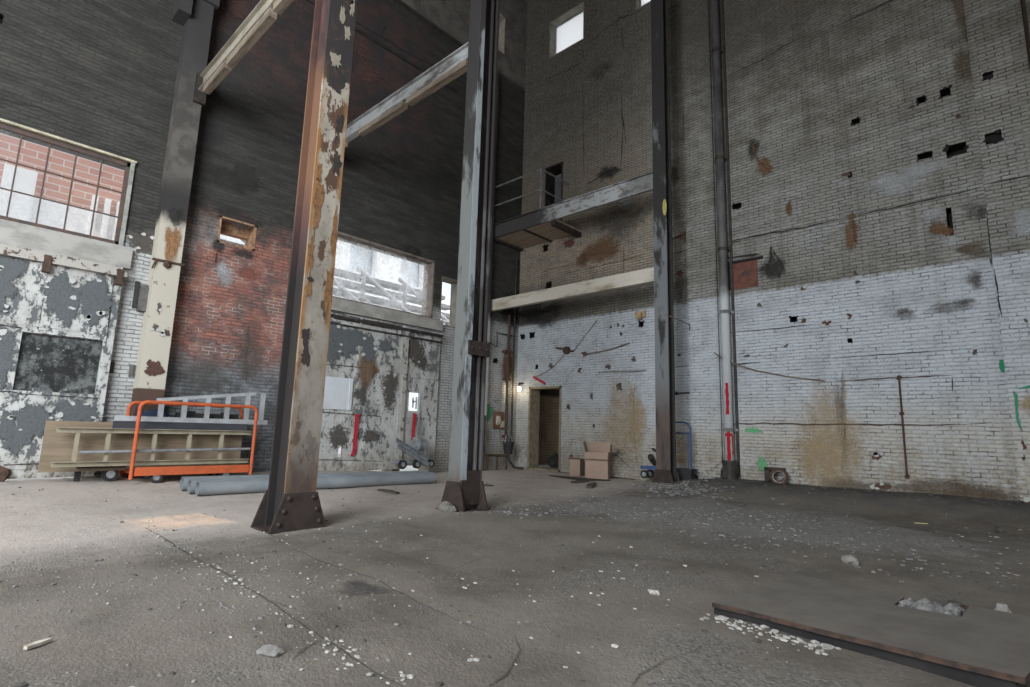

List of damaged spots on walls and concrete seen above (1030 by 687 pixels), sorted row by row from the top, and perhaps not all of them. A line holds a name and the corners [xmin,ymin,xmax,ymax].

peeling [340,0,355,40]
rust [749,139,772,175]
rust [577,239,621,266]
rust [846,213,858,249]
peeling [42,267,116,330]
peeling [0,255,29,393]
peeling [327,317,394,369]
peeling [408,338,428,371]
peeling [380,365,400,411]
peeling [0,398,105,456]
peeling [327,424,384,451]
crack [144,527,403,687]